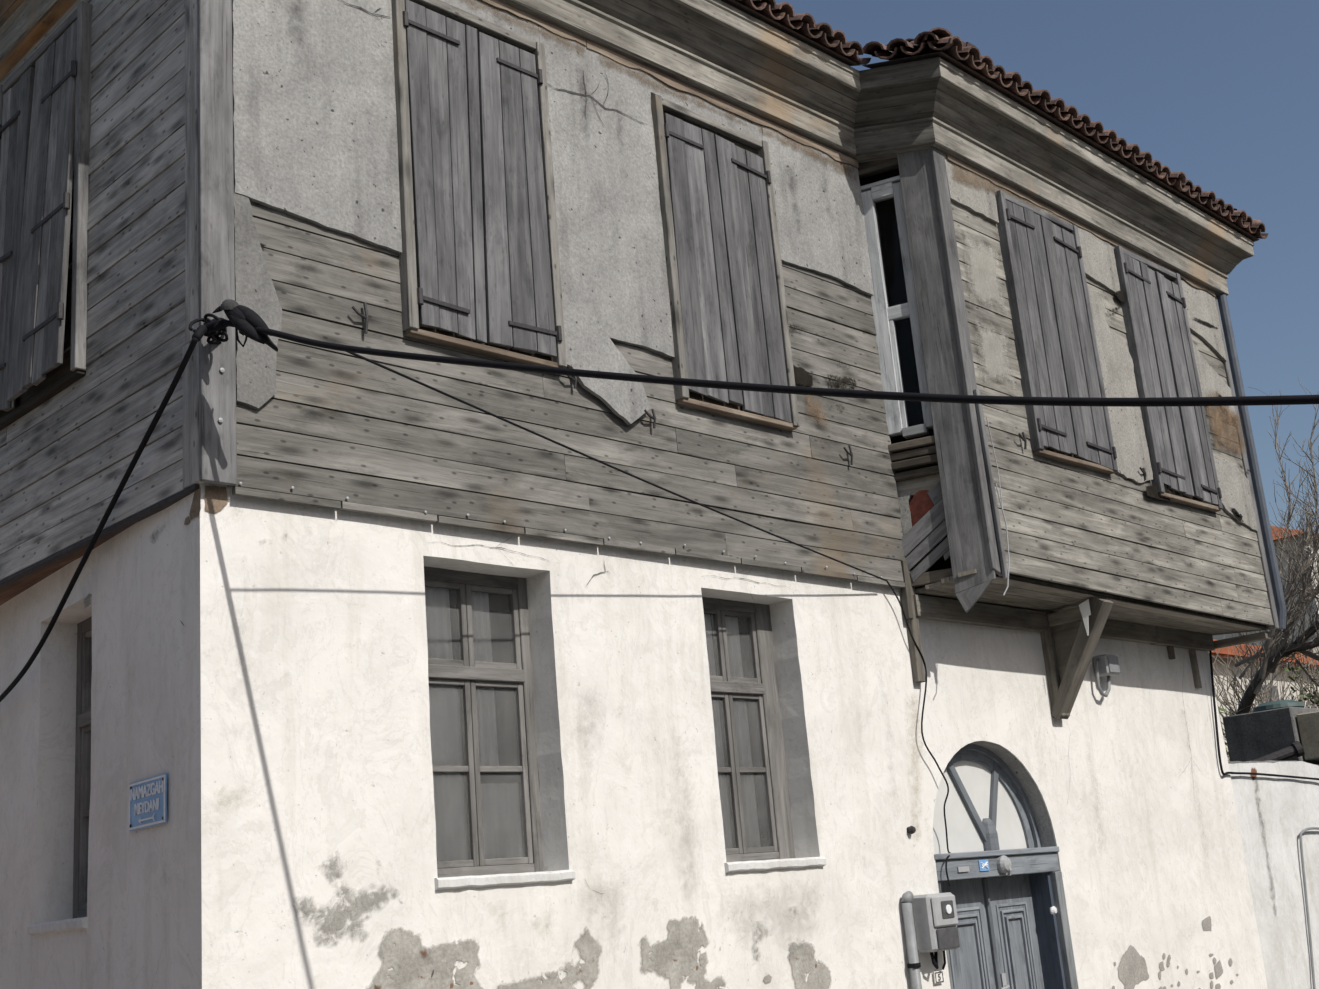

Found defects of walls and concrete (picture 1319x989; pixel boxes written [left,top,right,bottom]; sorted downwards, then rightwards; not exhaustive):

crack [547,72,645,128]
peeling [300,859,396,944]
peeling [1202,916,1211,931]
peeling [369,928,602,989]
peeling [641,916,725,989]
peeling [789,943,831,989]
peeling [1112,945,1238,989]